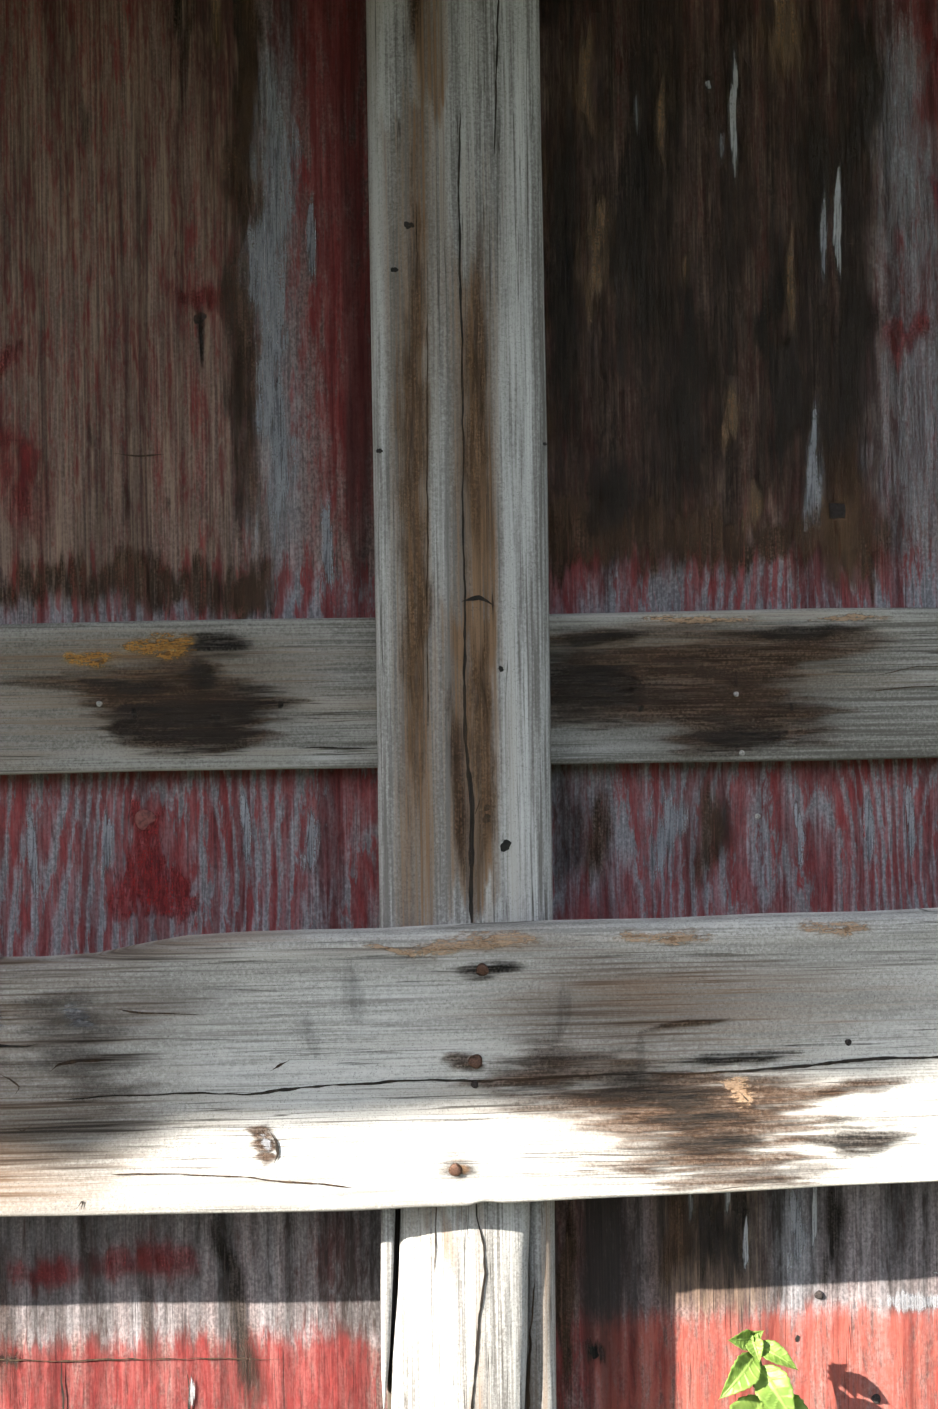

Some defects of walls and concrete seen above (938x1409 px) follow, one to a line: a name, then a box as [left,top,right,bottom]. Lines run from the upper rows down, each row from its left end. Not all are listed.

peeling [719,62,738,176]
water stain [541,0,887,586]
peeling [820,168,841,281]
water stain [0,0,309,755]
crack [415,0,499,923]
water stain [550,620,884,756]
rust [456,961,522,980]
crack [0,1044,525,1189]
rust [443,1052,484,1070]
water stain [460,1040,914,1284]
crack [598,1056,938,1076]
crack [471,1204,487,1409]